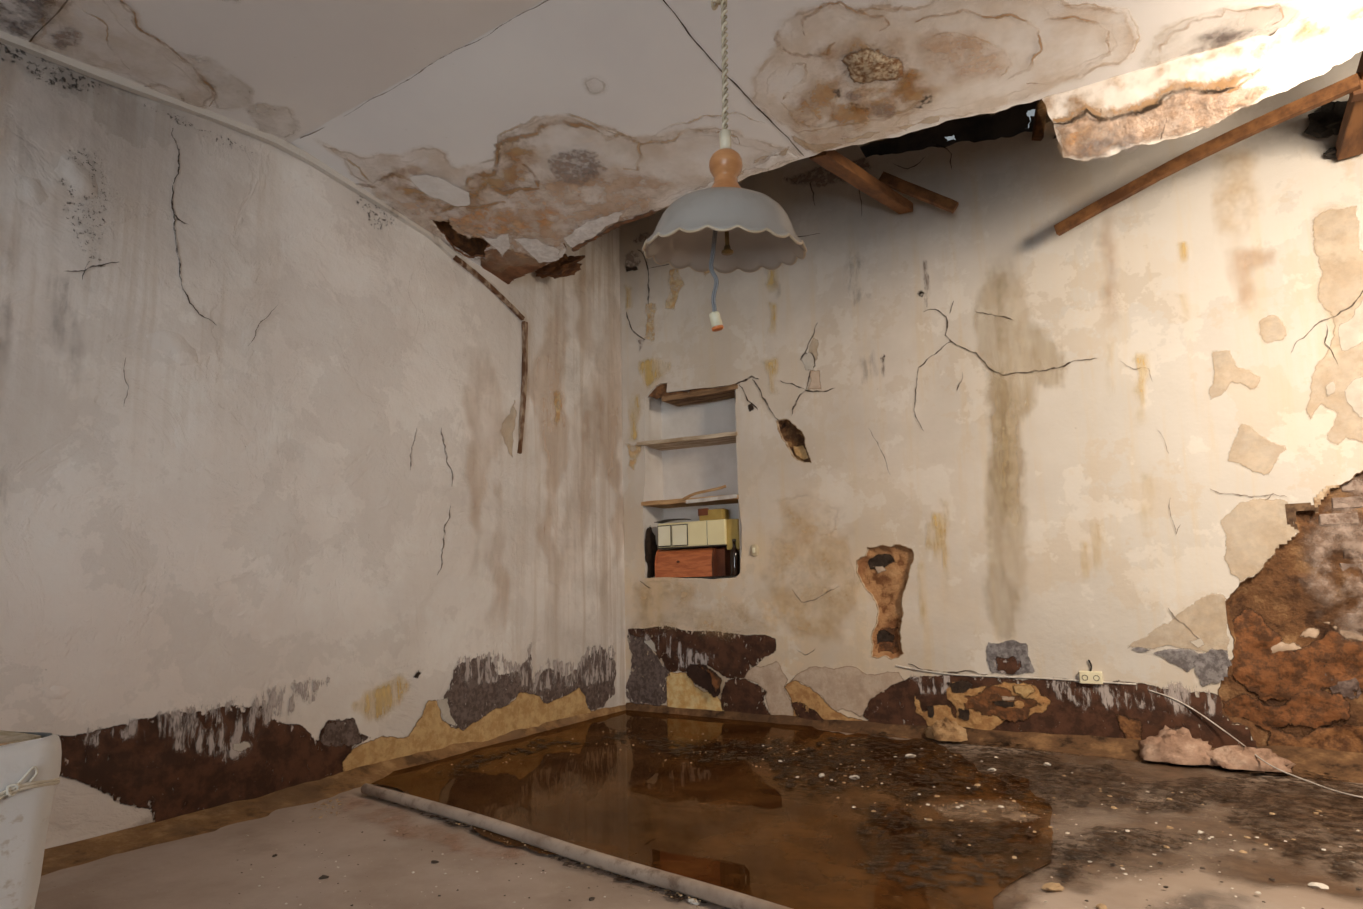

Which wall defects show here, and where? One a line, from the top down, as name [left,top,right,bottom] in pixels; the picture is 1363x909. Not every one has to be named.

leakage [799,70,932,131]
leakage [349,124,678,258]
crack [170,130,217,326]
peeling [1259,315,1286,343]
peeling [1306,206,1363,444]
spalling [648,384,718,399]
crack [914,301,1152,431]
peeling [1209,350,1260,398]
spalling [776,418,812,463]
peeling [1228,424,1286,475]
peeling [967,756,1082,836]
peeling [1180,821,1296,873]